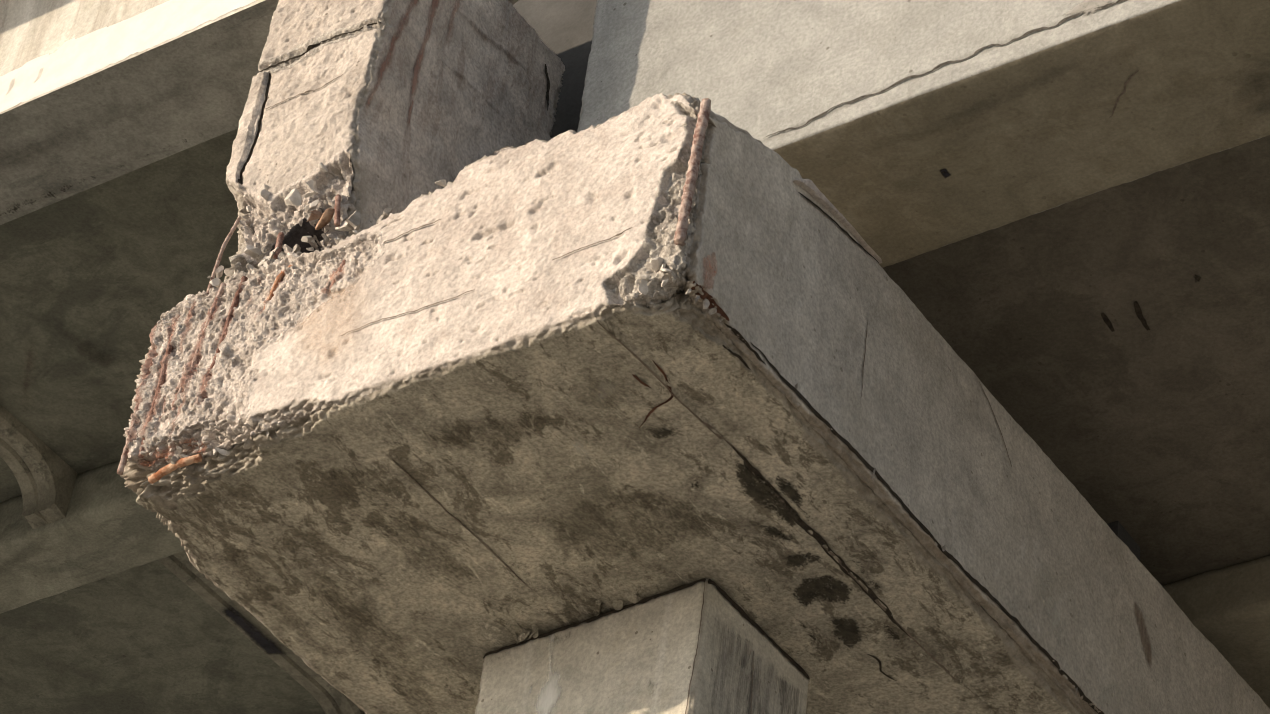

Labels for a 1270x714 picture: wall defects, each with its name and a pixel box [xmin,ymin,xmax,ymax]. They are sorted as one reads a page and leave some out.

crack [238,15,386,184]
crack [766,0,1125,137]
spalling [601,98,711,308]
spalling [117,149,392,484]
crack [387,455,532,590]
water stain [646,428,673,439]
water stain [730,455,810,541]
crack [595,281,1104,714]
water stain [222,608,284,654]
water stain [787,552,861,647]